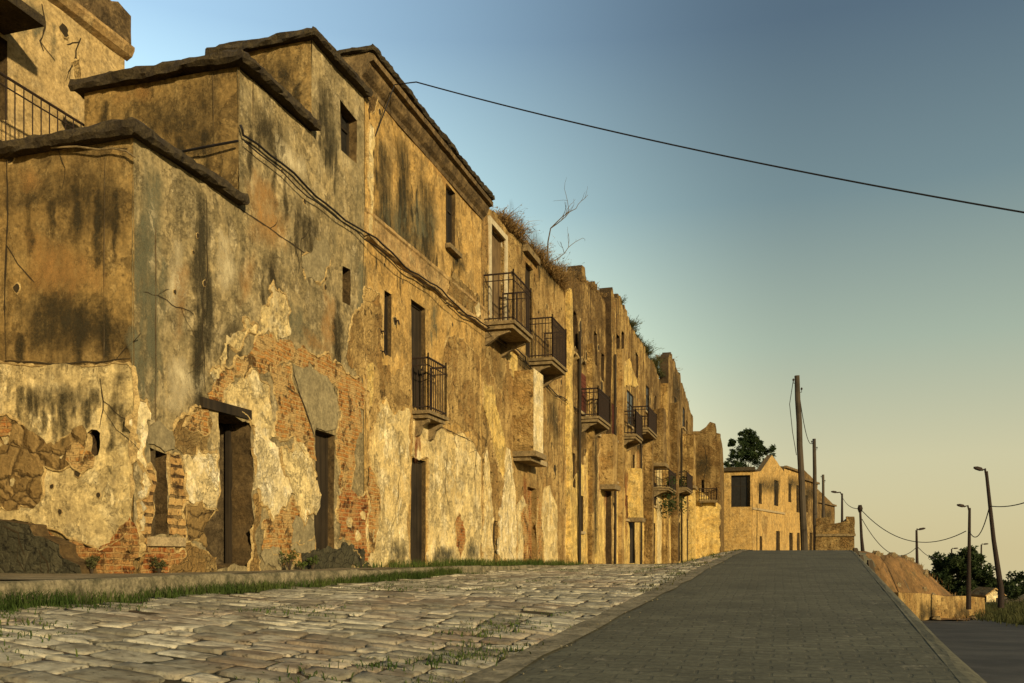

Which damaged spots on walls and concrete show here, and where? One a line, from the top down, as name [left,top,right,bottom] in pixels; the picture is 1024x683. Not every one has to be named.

flaking render [0,413,95,511]
flaking render [46,279,422,578]